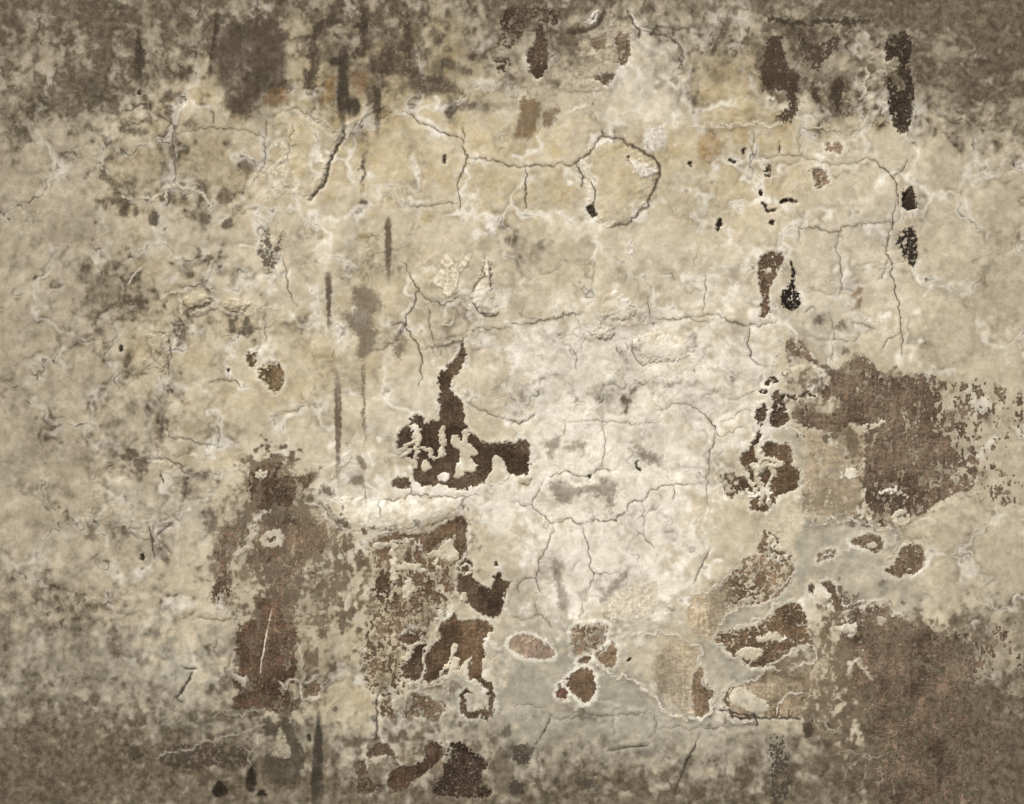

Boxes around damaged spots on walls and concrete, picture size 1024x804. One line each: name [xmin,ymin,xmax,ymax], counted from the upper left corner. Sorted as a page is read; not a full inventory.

leakage [134,31,146,73]
leakage [303,6,459,138]
leakage [696,14,870,129]
crack [310,130,345,201]
crack [408,113,661,227]
crack [375,259,580,386]
spalling [388,339,534,493]
spalling [211,444,329,713]
crack [512,391,744,626]
spalling [686,338,1024,804]
spalling [353,516,622,804]
leakage [803,719,842,739]